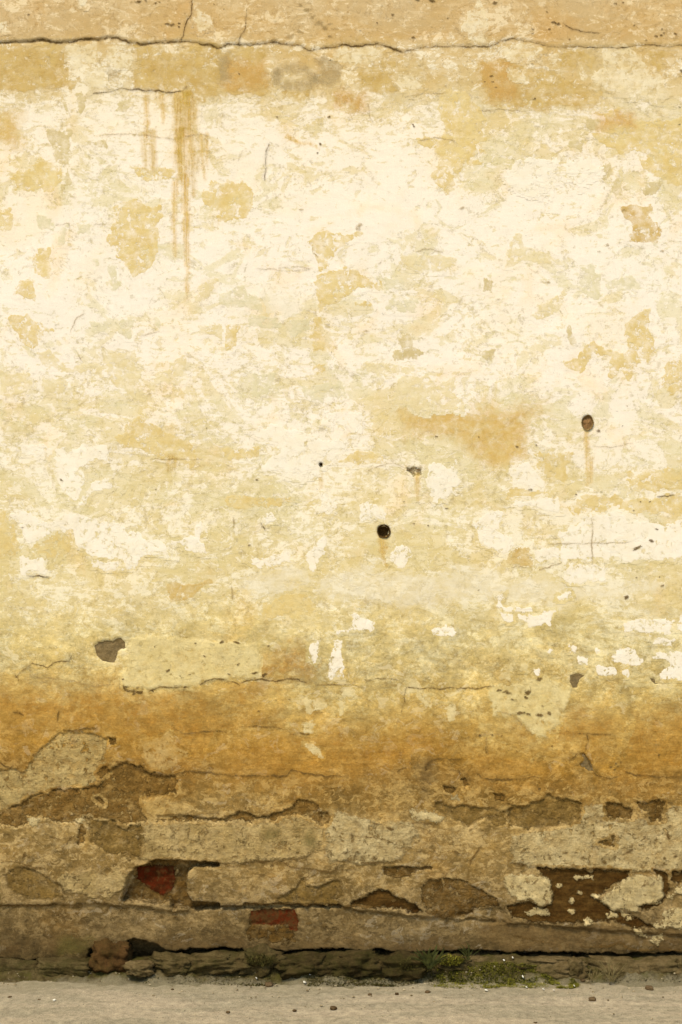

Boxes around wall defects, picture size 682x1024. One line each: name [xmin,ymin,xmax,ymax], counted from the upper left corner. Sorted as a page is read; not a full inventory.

crack [0,1,514,52]
peeling [0,0,682,249]
peeling [6,196,166,357]
peeling [0,275,246,579]
peeling [219,405,464,528]
spalling [95,638,125,662]
crack [200,677,346,685]
damp [0,635,682,806]
peeling [163,444,682,762]
spalling [0,727,333,916]
spalling [249,850,682,946]
spalling [409,774,585,833]